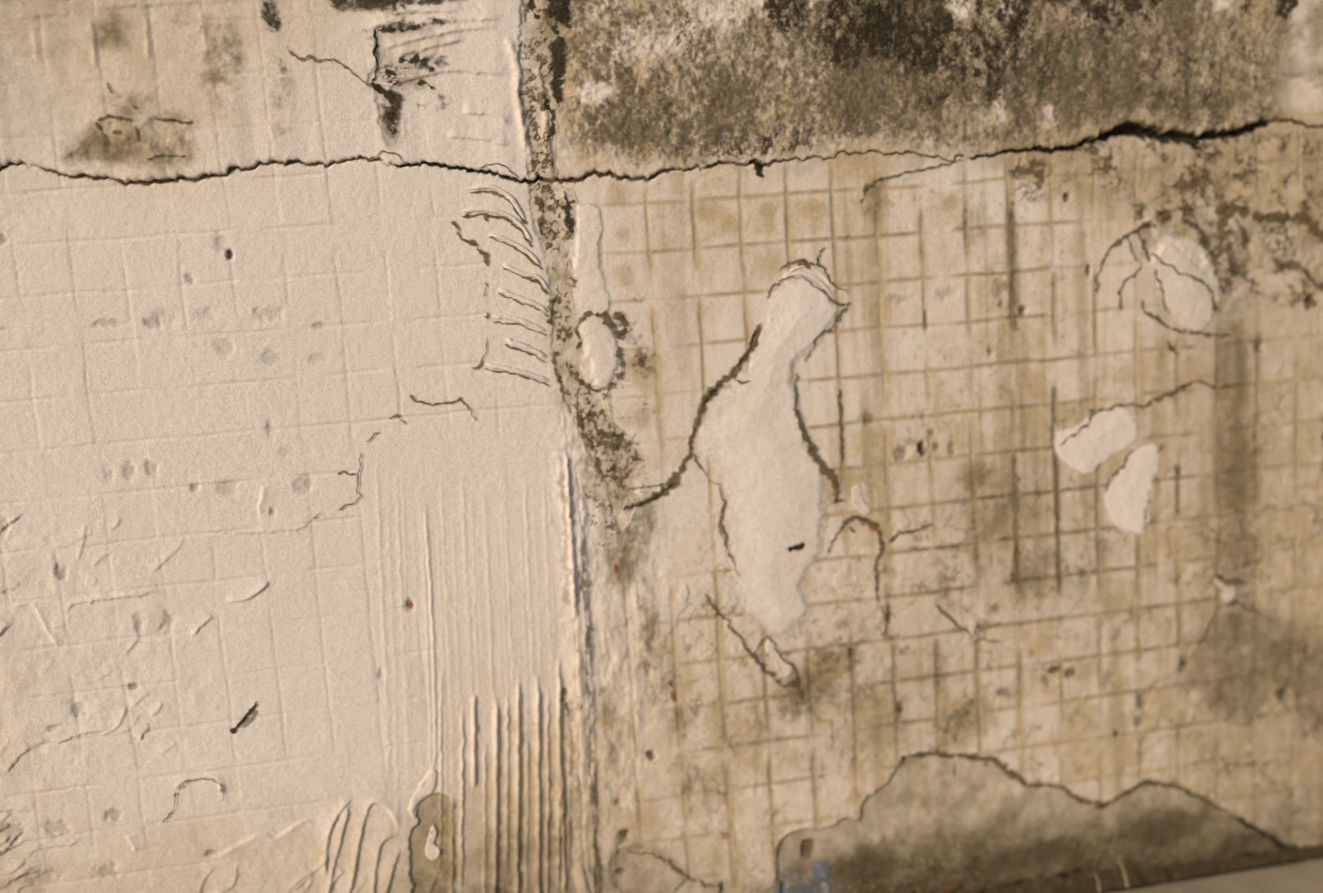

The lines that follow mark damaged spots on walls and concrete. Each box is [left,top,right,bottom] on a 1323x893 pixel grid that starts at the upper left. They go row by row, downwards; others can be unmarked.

damp [331,0,443,30]
damp [378,57,446,138]
damp [569,0,1298,164]
crack [0,119,1323,203]
spalling [1127,137,1323,313]
crack [623,247,932,637]
crack [1049,221,1236,591]
crack [705,594,803,700]
spalling [408,770,456,893]
peeling [609,846,683,893]
spalling [776,754,1287,893]
crack [899,751,1287,848]